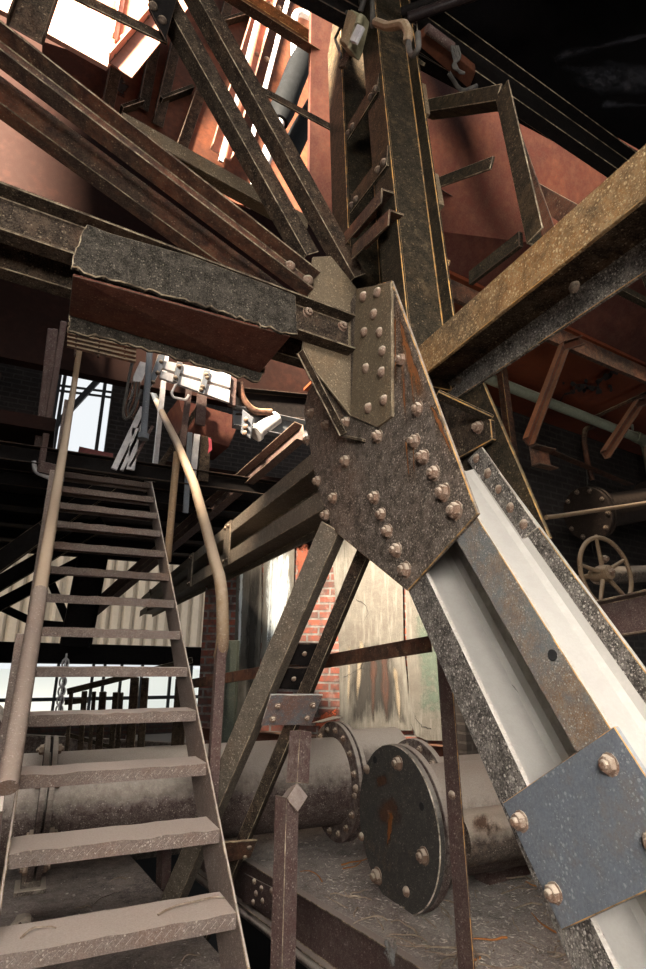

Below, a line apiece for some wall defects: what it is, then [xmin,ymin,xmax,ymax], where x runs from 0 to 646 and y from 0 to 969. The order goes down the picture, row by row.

rust [394,311,423,417]
rust [431,406,451,452]